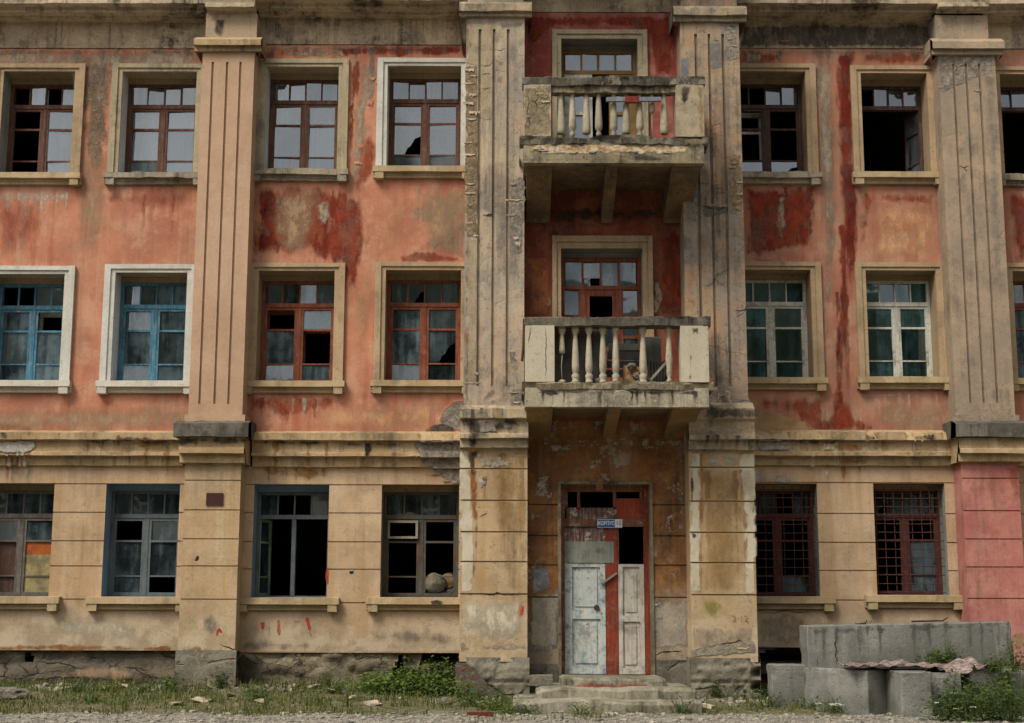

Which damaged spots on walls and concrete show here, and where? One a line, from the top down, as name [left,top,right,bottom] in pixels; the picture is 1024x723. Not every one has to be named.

peeling [531,145,688,154]
peeling [413,66,526,487]
peeling [0,441,35,471]
leakage [655,398,838,648]
crack [18,661,88,681]
crack [118,667,165,680]